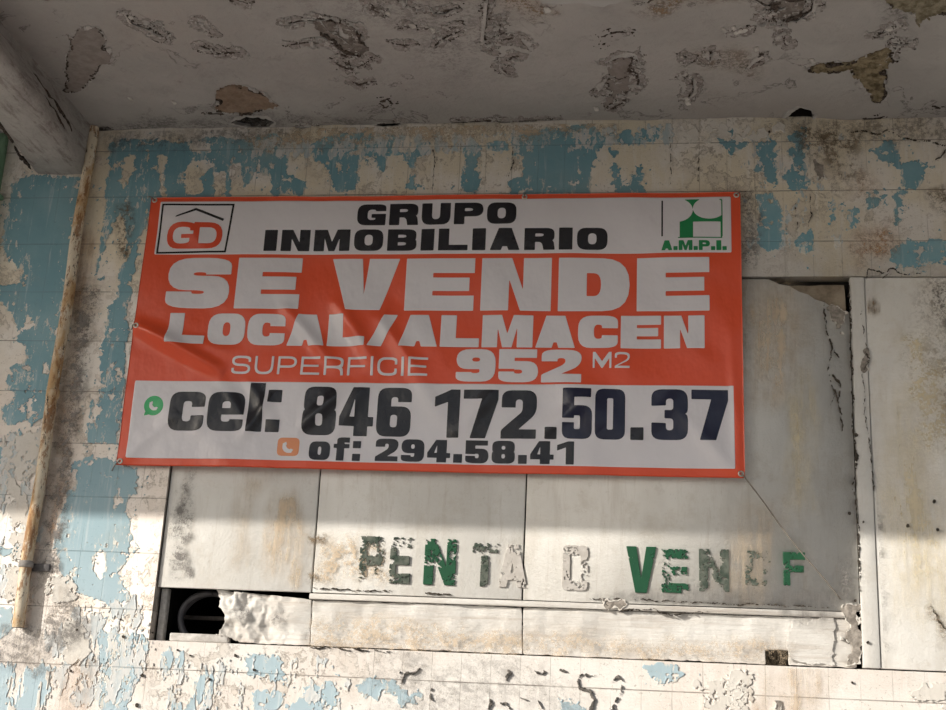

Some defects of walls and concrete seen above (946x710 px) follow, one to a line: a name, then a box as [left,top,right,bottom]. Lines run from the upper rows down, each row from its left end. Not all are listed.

flaking render [62,25,113,93]
flaking render [308,17,369,58]
flaking render [770,0,811,23]
spalling [804,47,901,103]
spalling [885,0,946,27]
peeling [451,124,661,195]
peeling [717,106,827,269]
peeling [828,134,946,274]
peeling [0,84,433,710]
crack [823,268,921,594]
peeling [558,698,586,710]
peeling [642,662,754,710]